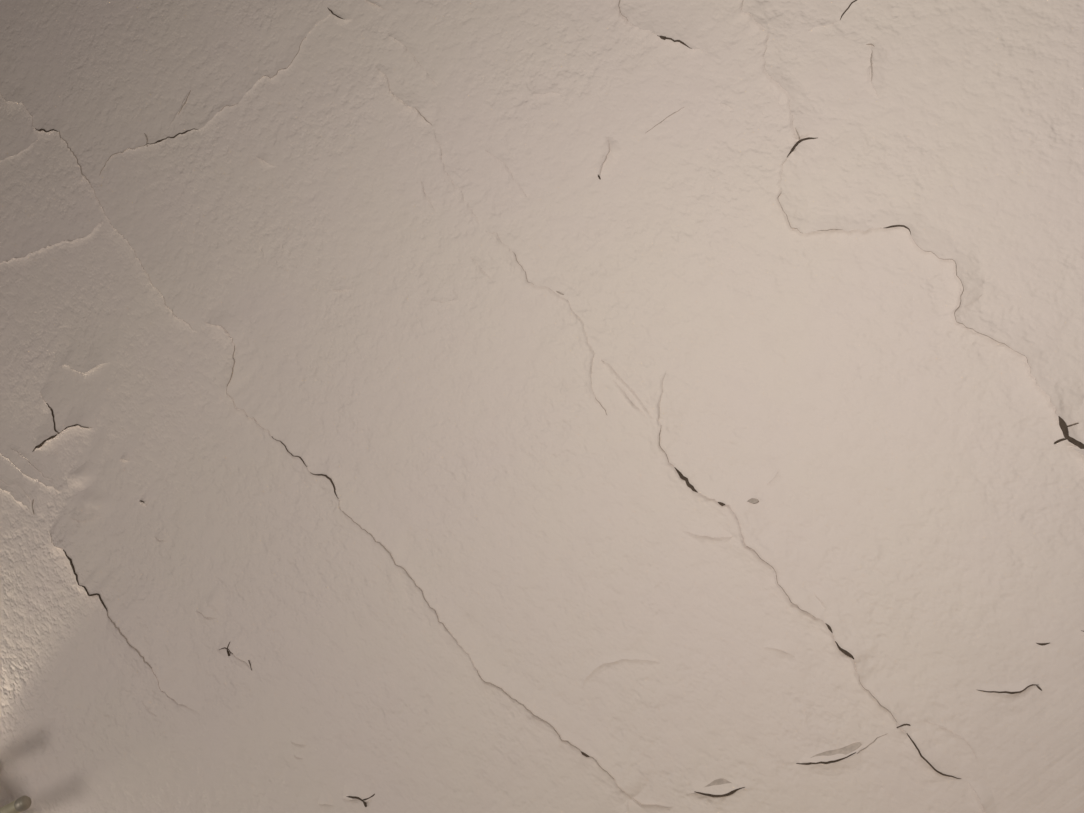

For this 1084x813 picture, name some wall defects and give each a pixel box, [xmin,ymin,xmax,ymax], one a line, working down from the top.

peeling [685,777,754,806]
peeling [796,720,1009,813]